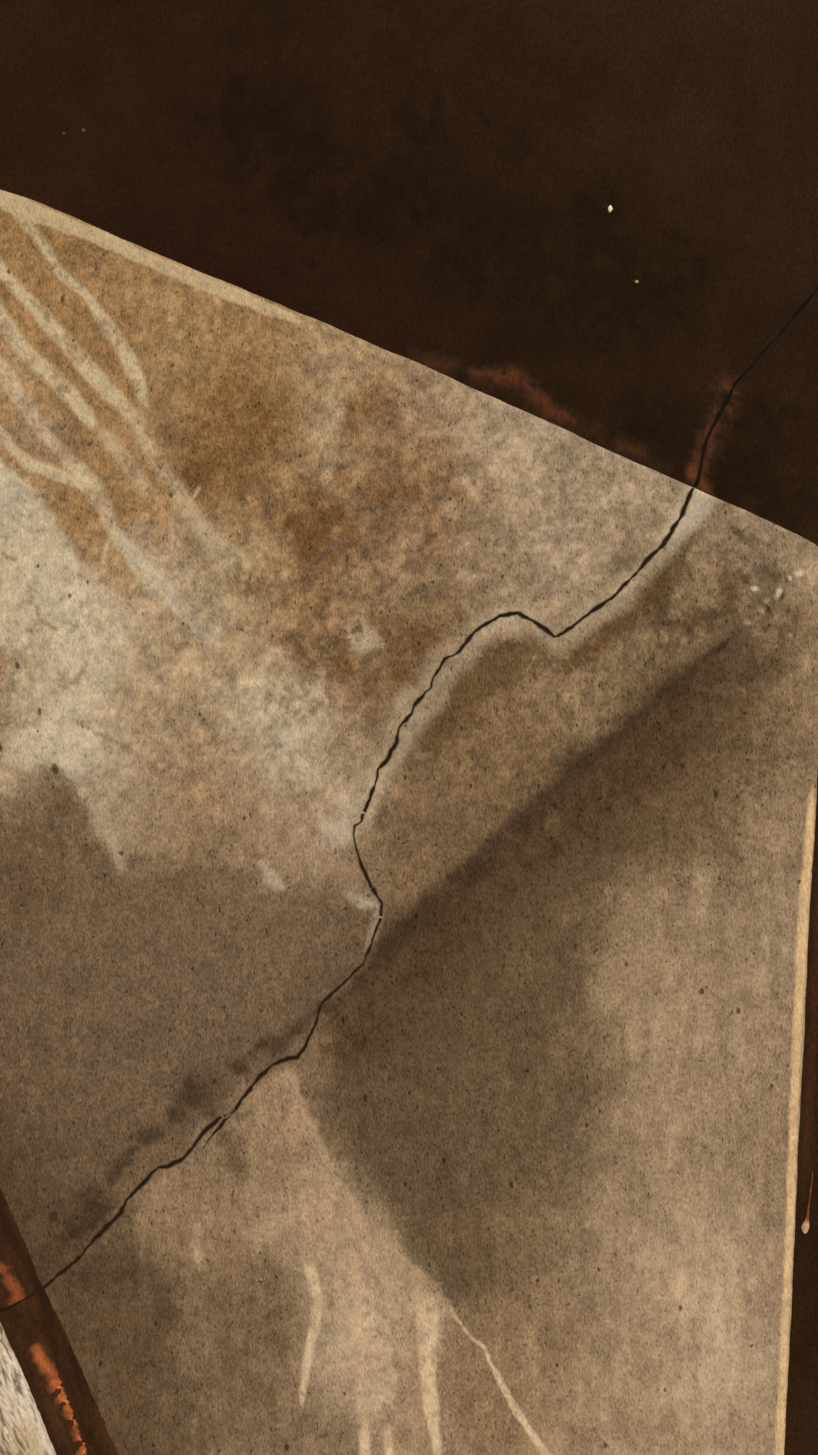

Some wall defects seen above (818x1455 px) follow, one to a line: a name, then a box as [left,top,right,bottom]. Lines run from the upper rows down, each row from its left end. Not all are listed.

water stain [0,216,441,1285]
crack [0,281,818,1314]
water stain [46,579,818,1455]
water stain [169,48,818,1034]
corrosion [405,341,742,497]